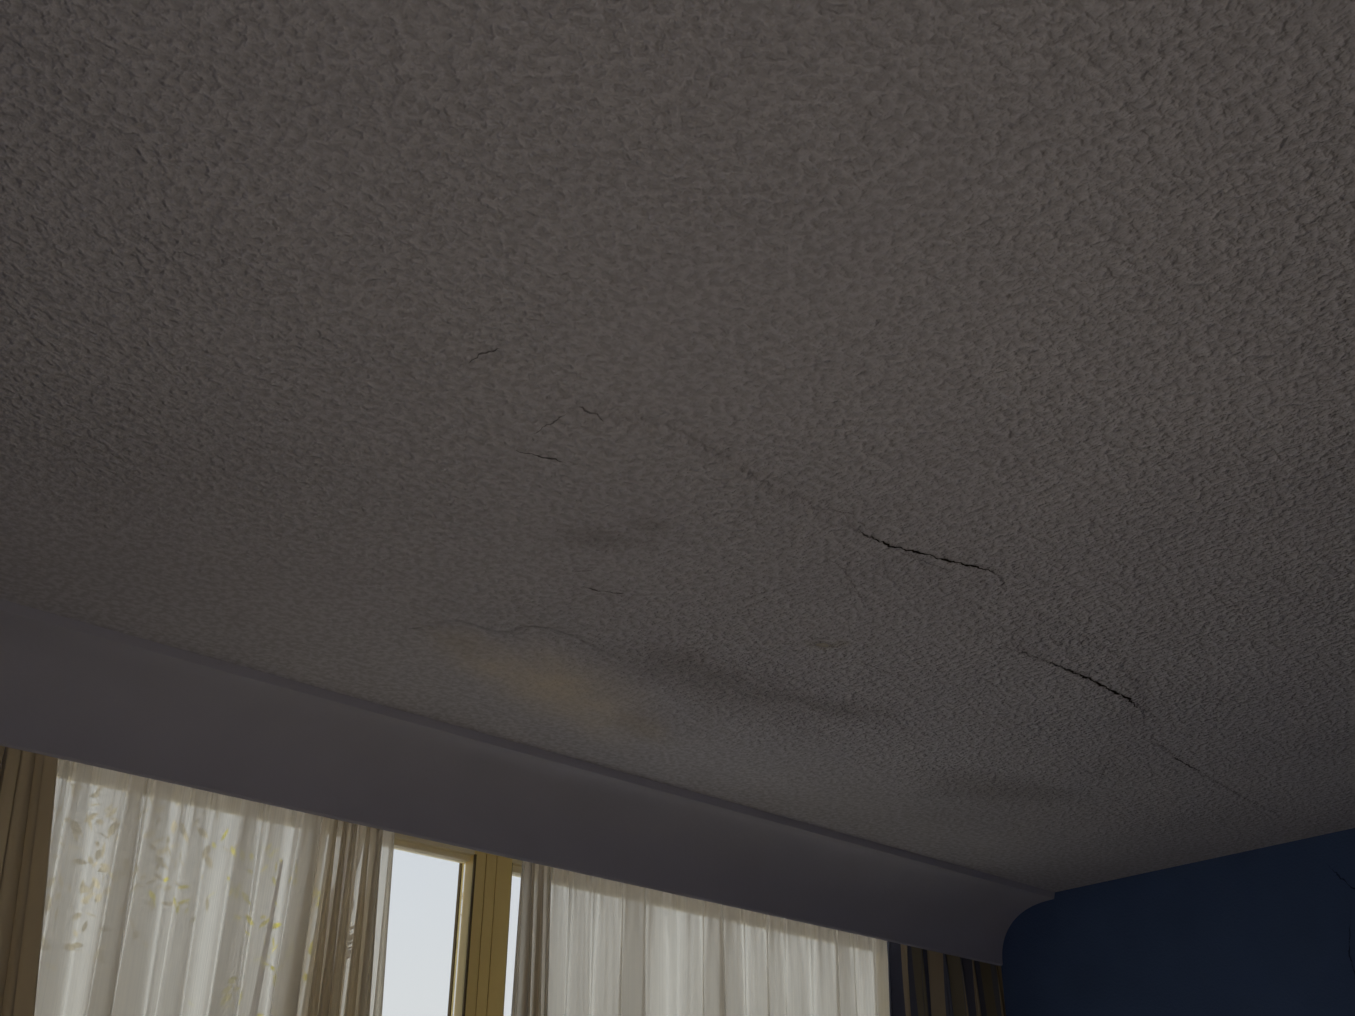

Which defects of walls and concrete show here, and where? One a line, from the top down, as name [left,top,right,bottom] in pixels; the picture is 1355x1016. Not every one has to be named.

crack [520,407,602,463]
crack [860,531,993,572]
crack [1006,647,1135,707]